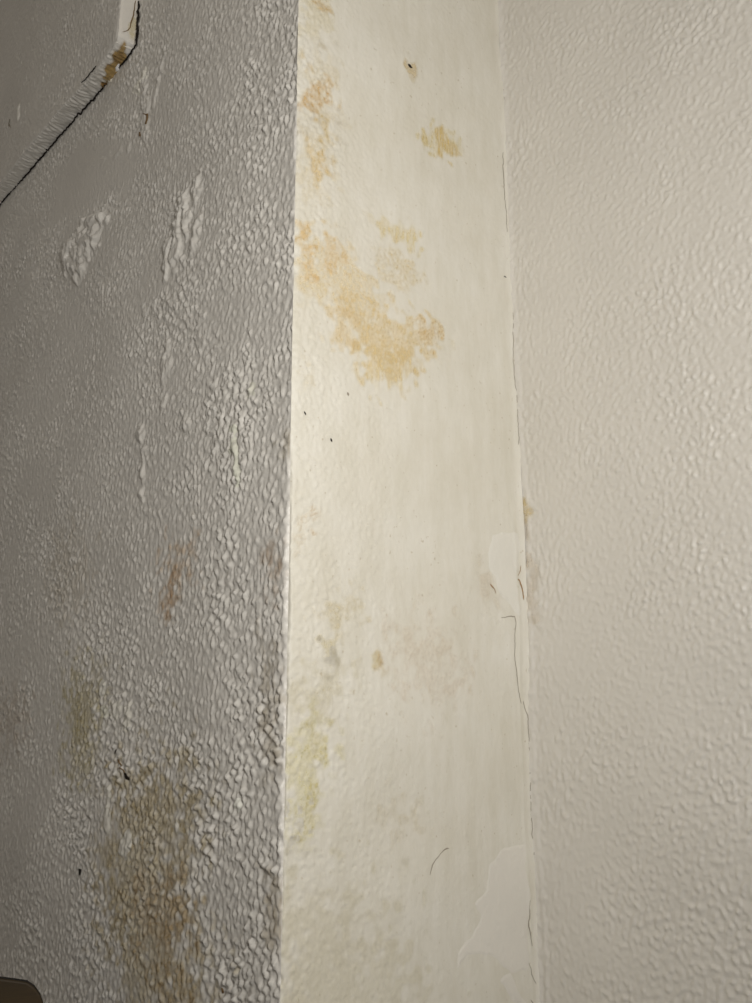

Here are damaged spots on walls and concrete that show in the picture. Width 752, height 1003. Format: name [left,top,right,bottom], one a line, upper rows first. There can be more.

crack [0,1,140,205]